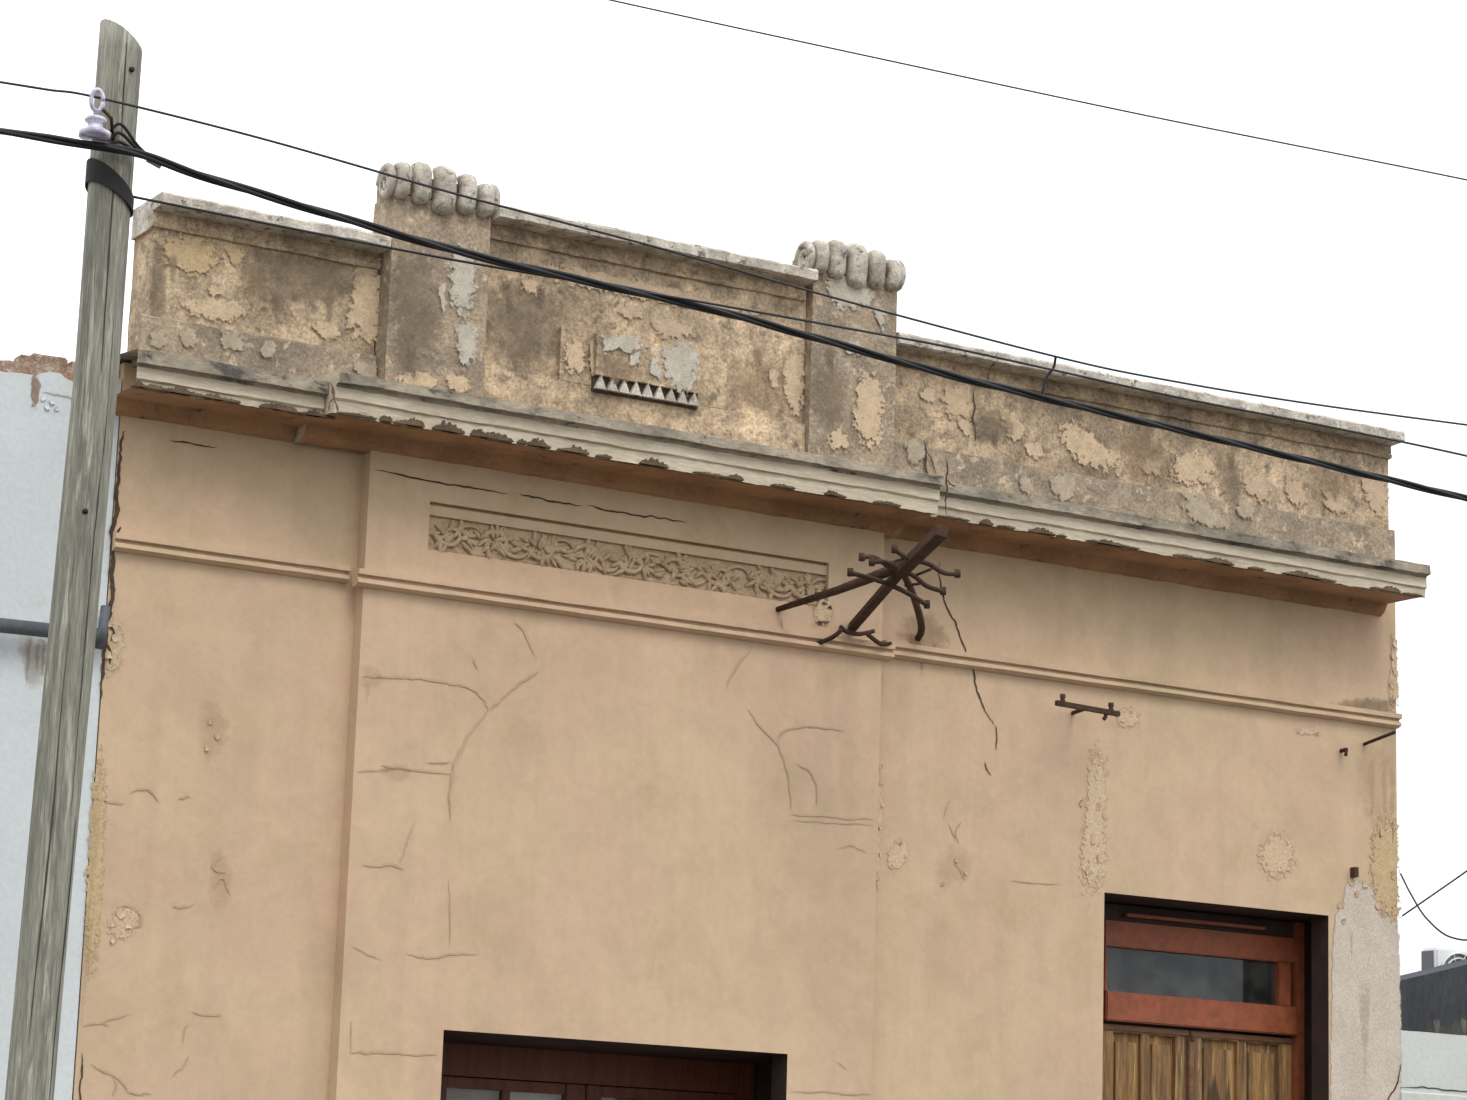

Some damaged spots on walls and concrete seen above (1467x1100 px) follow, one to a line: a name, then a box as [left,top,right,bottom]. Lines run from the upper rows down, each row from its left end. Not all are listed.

peeling [149,230,276,358]
peeling [312,241,479,393]
peeling [823,276,885,332]
peeling [826,340,887,453]
peeling [919,383,973,436]
peeling [1001,410,1348,531]
peeling [1361,471,1389,521]
crack [938,564,997,775]
crack [357,622,539,869]
peeling [1078,740,1109,895]
peeling [1330,809,1402,1100]
crack [79,1011,220,1100]